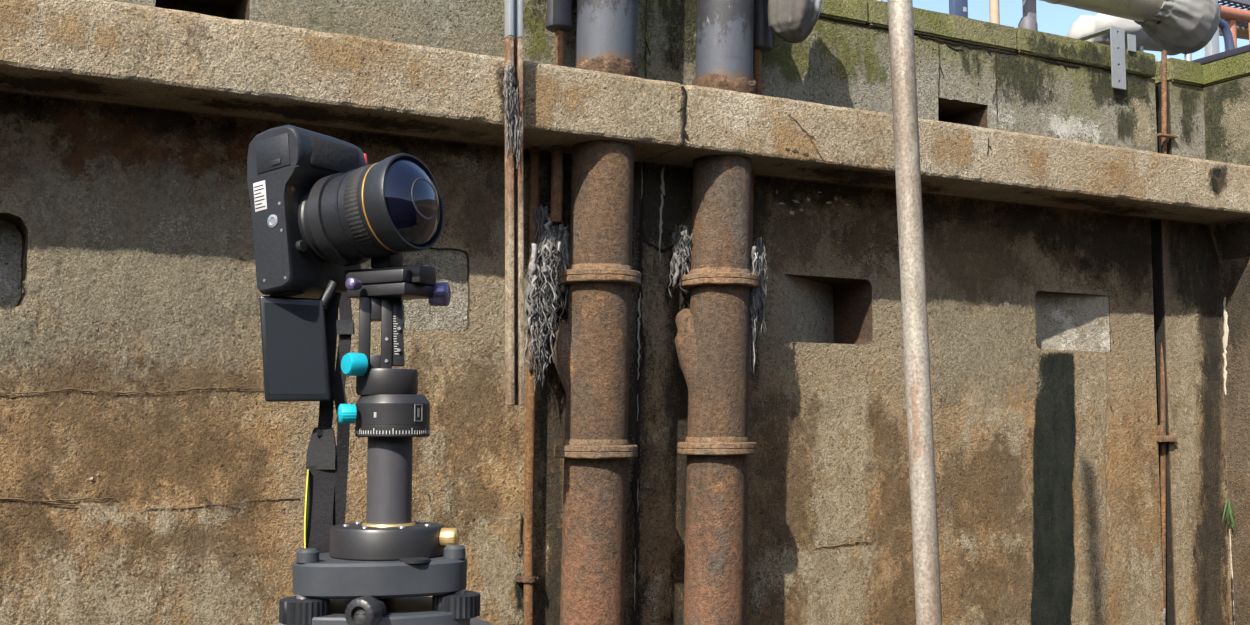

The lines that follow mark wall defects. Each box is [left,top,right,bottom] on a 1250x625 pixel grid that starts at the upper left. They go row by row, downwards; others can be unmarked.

crack [677,86,688,145]
damp [991,104,1015,130]
damp [1041,115,1106,144]
damp [1131,100,1156,147]
damp [929,221,1250,625]
crack [146,497,299,510]